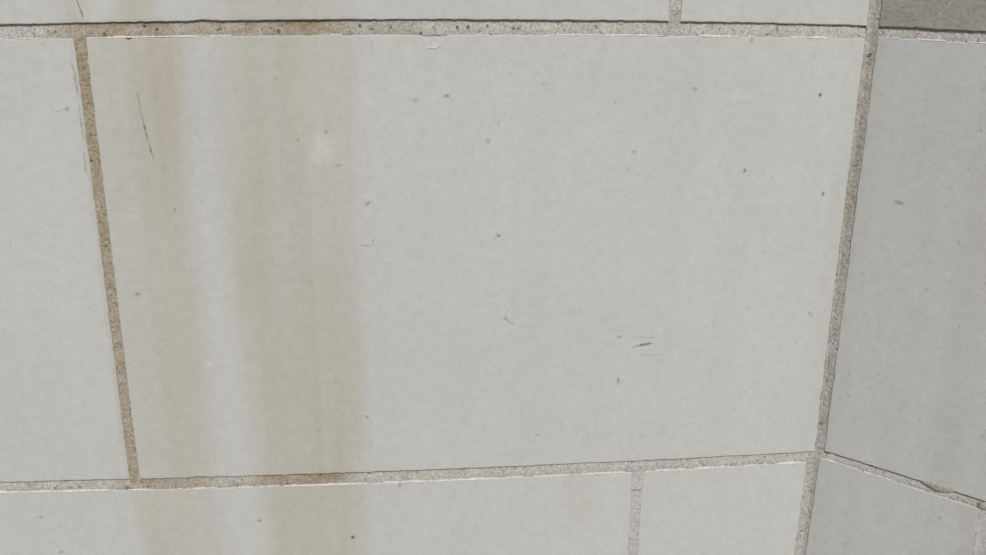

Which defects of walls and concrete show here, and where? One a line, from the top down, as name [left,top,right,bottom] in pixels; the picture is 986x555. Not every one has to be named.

water stain [52,0,166,21]
water stain [198,0,364,18]
water stain [88,38,375,477]
water stain [253,486,376,555]